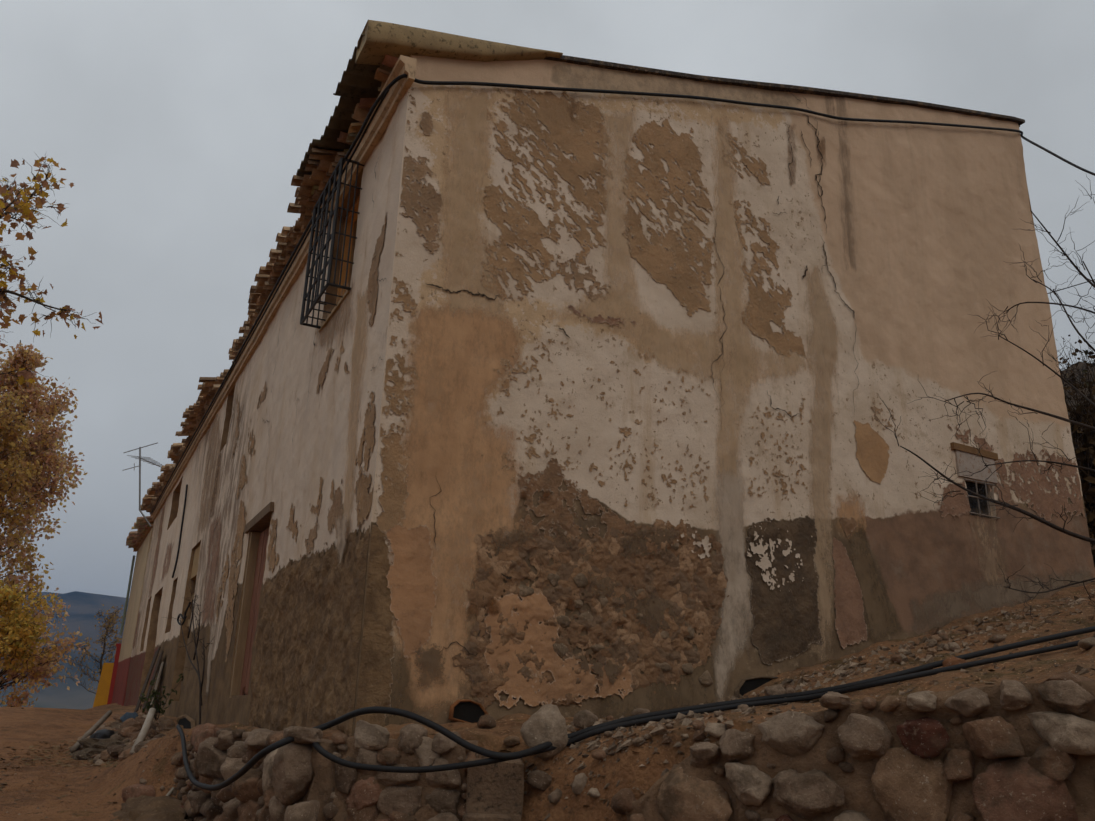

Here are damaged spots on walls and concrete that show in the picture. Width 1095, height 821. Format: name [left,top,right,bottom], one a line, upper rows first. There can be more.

spalling [247,277,419,737]
peeling [367,146,443,327]
crack [425,283,496,301]
spalling [484,587,633,708]
peeling [478,86,718,326]
spalling [493,338,712,538]
crack [711,215,727,426]
damp [551,113,901,719]
peeling [729,196,808,359]
spalling [735,515,823,698]
crack [774,93,859,412]
peeling [948,424,1086,521]